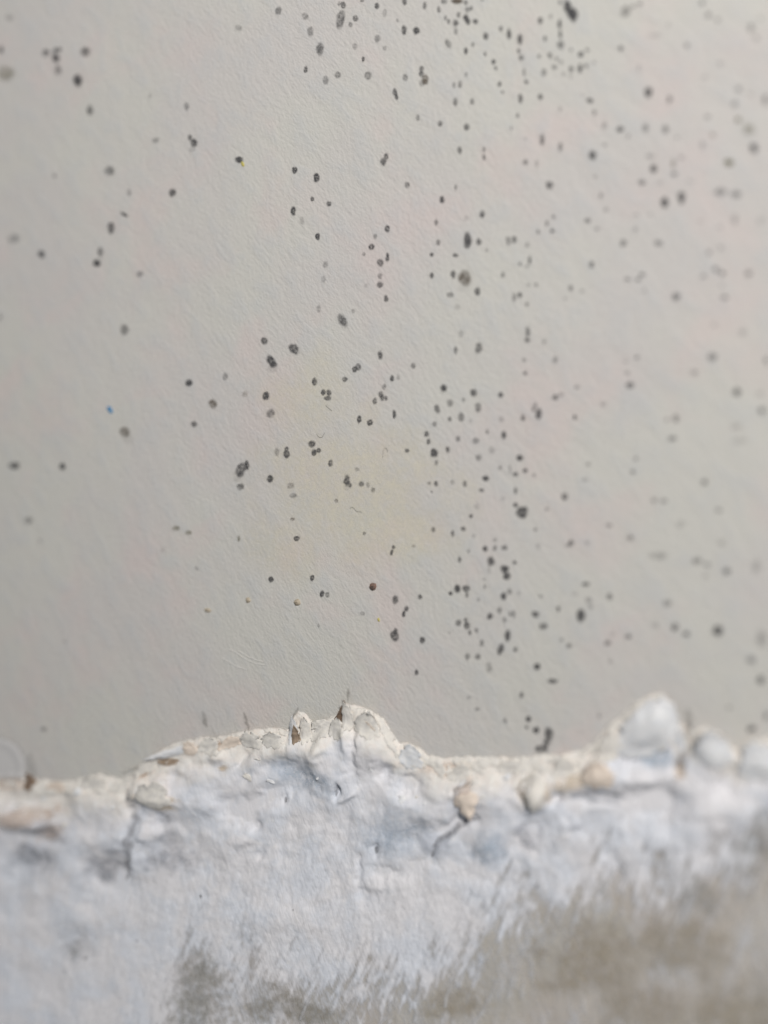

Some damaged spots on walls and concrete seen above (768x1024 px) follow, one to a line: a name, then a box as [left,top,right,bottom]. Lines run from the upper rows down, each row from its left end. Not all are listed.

mould [538,1,589,74]
mould [513,455,527,518]
mould [483,546,516,600]
peeling [1,693,768,825]
leakage [0,693,768,1024]